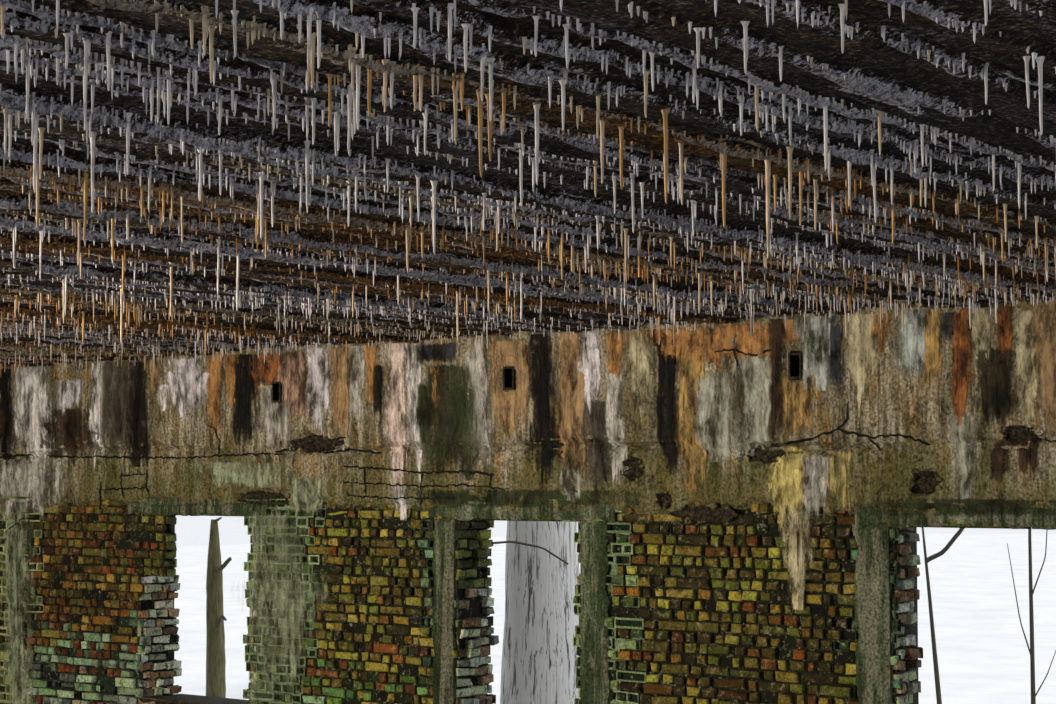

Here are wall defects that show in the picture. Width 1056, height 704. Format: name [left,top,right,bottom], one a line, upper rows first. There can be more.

rust [423,80,1056,285]
leakage [0,360,150,704]
leakage [159,357,209,418]
rust [554,332,586,483]
leakage [527,330,681,501]
leakage [695,313,879,610]
rust [781,373,819,436]
crack [783,401,931,452]
rust [922,308,973,426]
leakage [951,308,1040,499]
rust [996,306,1012,354]
spalling [994,425,1046,444]